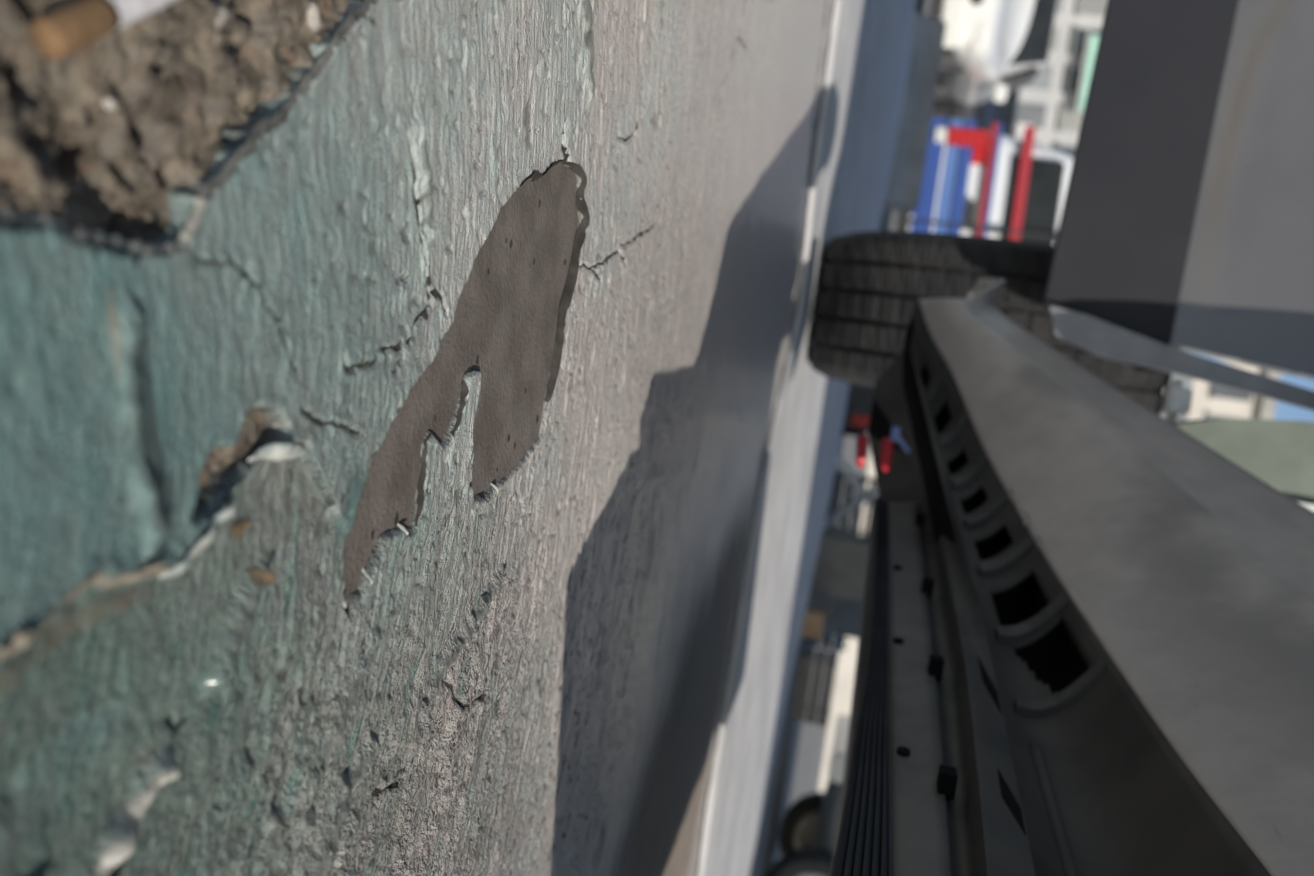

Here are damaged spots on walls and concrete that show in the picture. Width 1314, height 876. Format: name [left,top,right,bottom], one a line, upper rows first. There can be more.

spalling [0,0,375,255]
crack [579,203,660,290]
peeling [343,160,590,610]
crack [445,683,487,709]